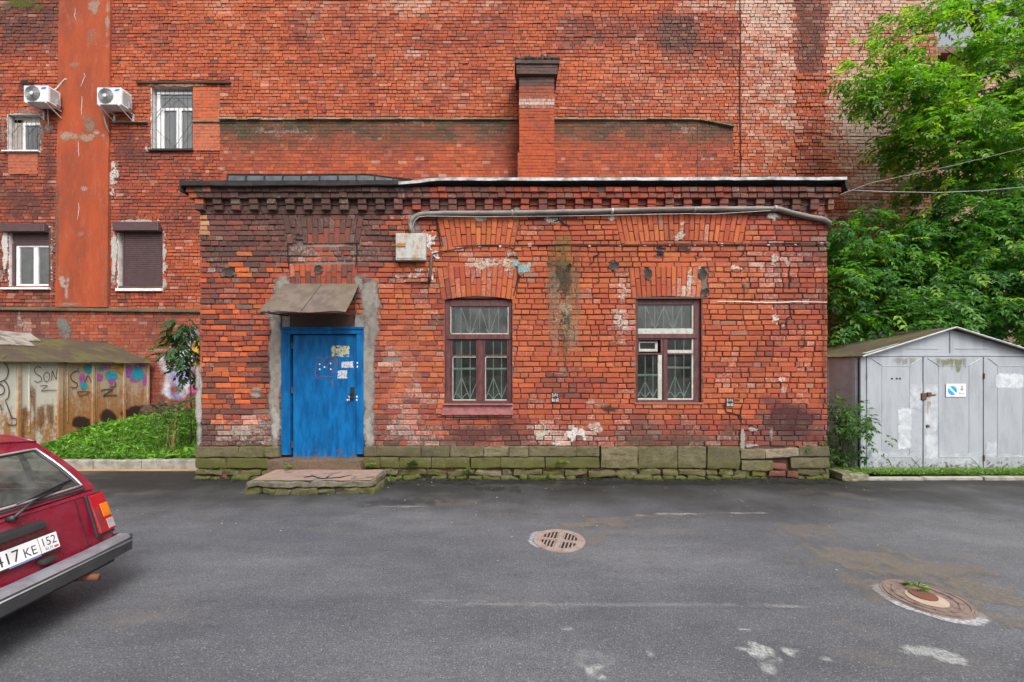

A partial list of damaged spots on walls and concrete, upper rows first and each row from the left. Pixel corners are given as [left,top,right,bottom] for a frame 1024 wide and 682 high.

peeling [61,116,105,142]
peeling [466,252,516,276]
damp [548,249,577,360]